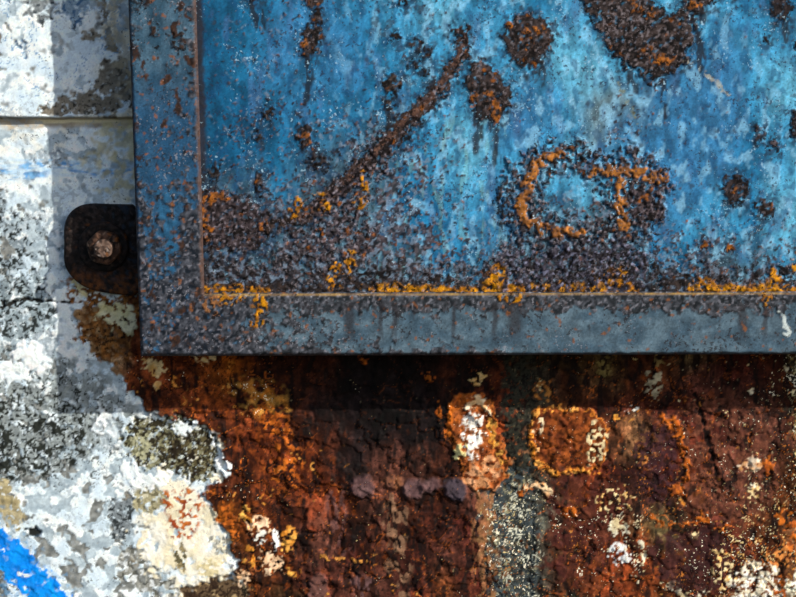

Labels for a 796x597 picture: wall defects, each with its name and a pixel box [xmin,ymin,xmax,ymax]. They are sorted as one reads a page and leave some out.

corrosion [130,0,186,51]
corrosion [201,0,796,293]
crack [0,291,70,311]
corrosion [58,264,796,597]